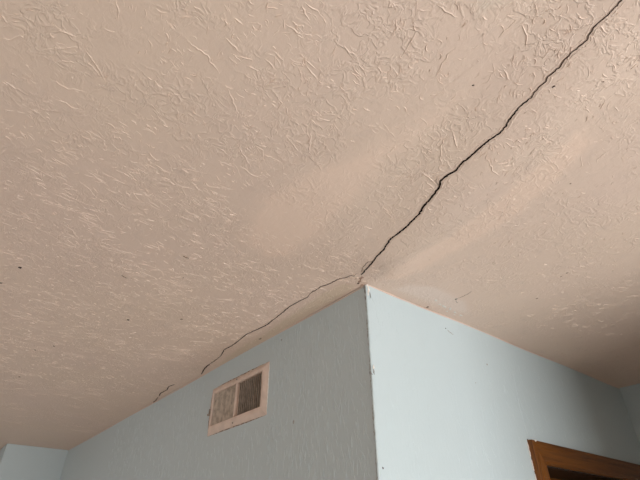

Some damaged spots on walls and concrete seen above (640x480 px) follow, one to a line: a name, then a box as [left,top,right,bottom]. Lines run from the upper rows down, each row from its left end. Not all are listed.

crack [201,0,627,374]
crack [365,300,378,480]